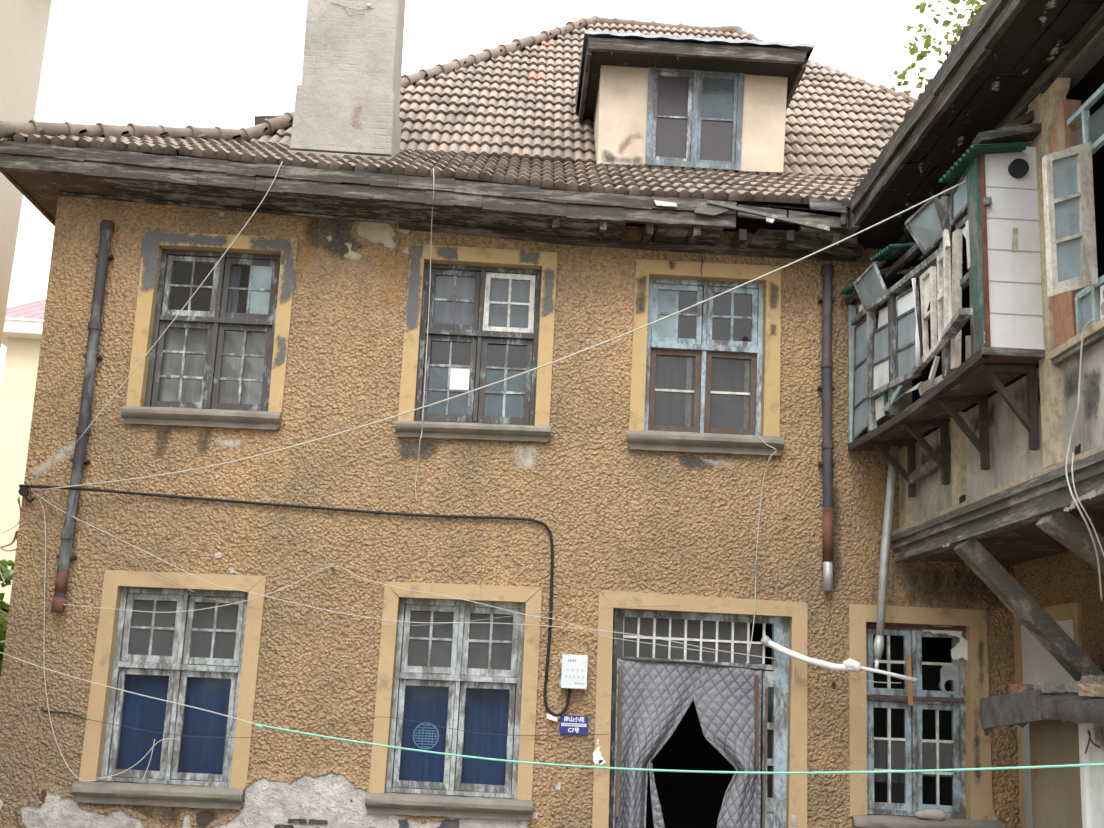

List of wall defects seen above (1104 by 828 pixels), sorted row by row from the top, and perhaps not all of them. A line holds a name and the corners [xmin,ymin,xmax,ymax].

peeling [344,221,410,261]
peeling [0,765,538,828]